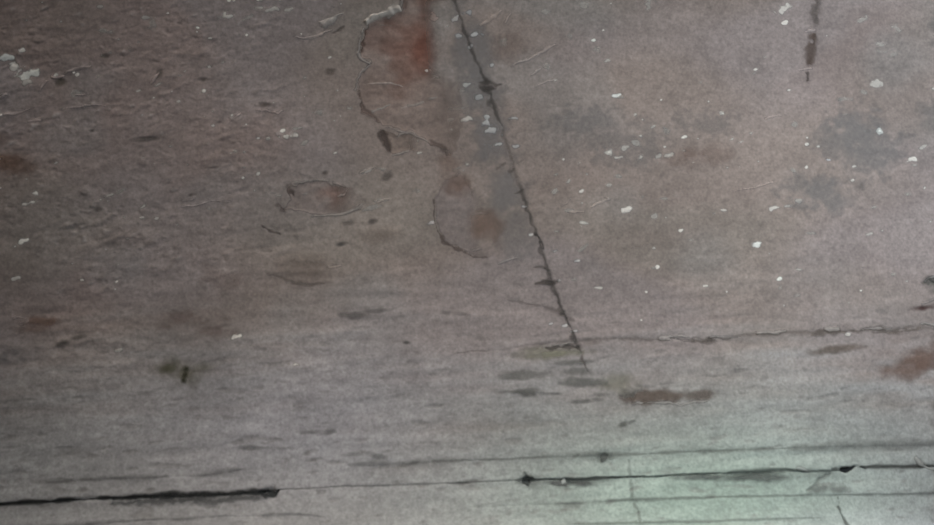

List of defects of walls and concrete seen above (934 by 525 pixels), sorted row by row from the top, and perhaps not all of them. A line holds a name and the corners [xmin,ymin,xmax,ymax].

crack [451,0,519,148]
peeling [378,127,429,156]
crack [521,190,586,368]
crack [522,453,839,486]
crack [861,462,934,470]
crack [0,488,279,506]